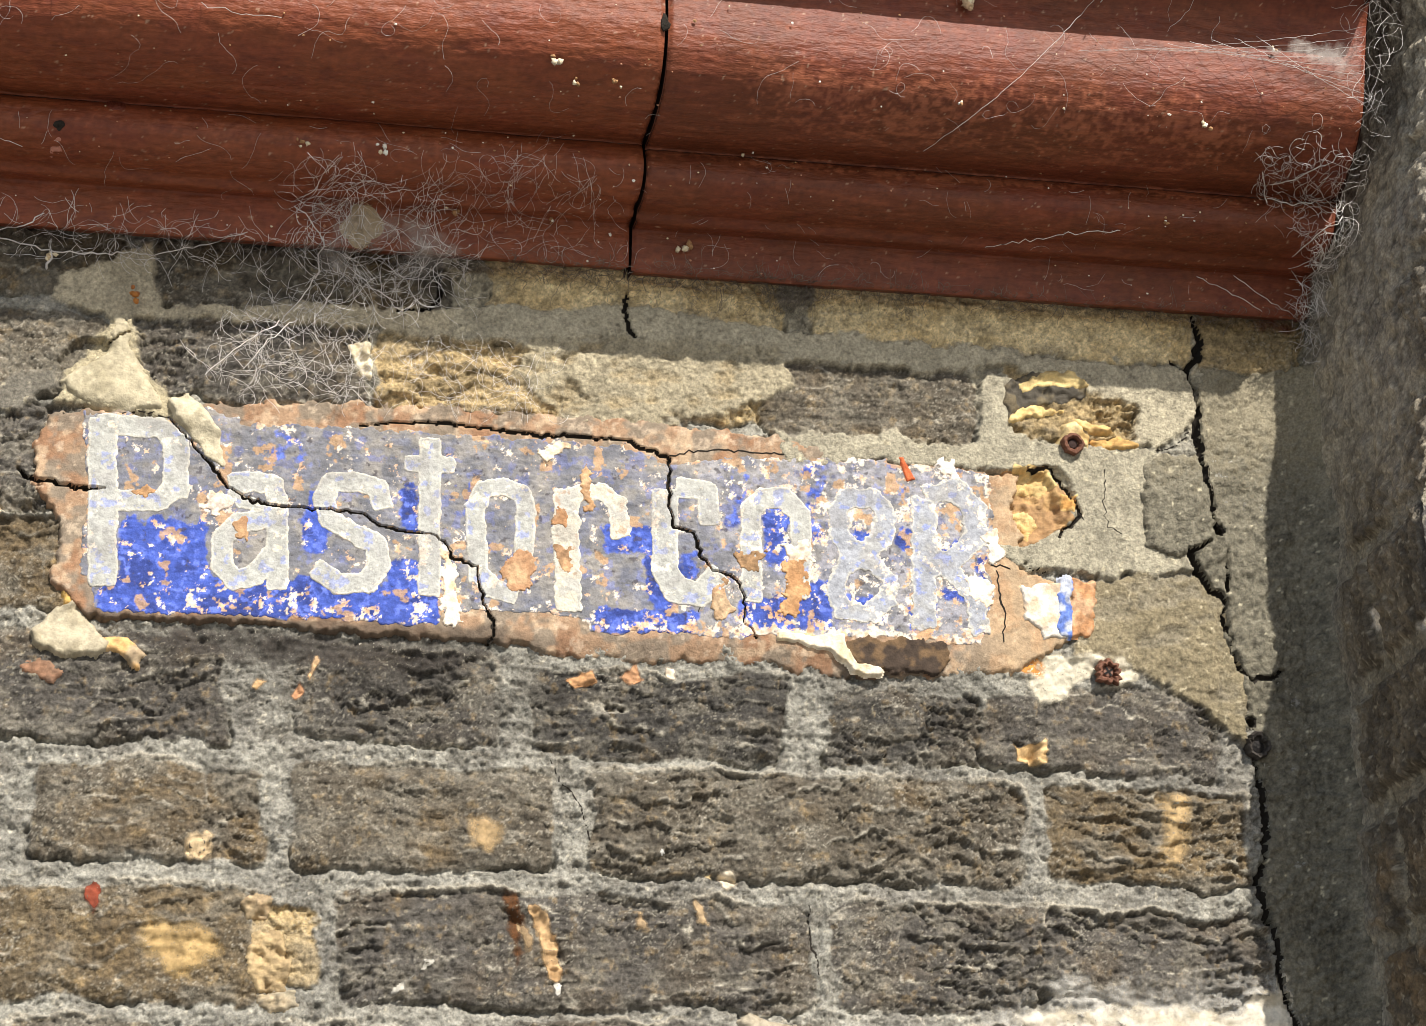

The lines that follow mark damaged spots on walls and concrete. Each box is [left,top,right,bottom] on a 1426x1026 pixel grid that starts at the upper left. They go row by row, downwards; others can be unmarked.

crack [20,469,98,492]
crack [122,410,495,645]
peeling [438,545,463,628]
crack [359,420,784,639]
spalling [710,539,951,679]
spalling [957,463,1078,608]
peeling [1056,574,1097,641]
rust [1022,653,1139,702]
crack [1156,316,1281,684]
spalling [240,893,299,1014]
spalling [517,904,563,982]
crack [1252,762,1300,1026]